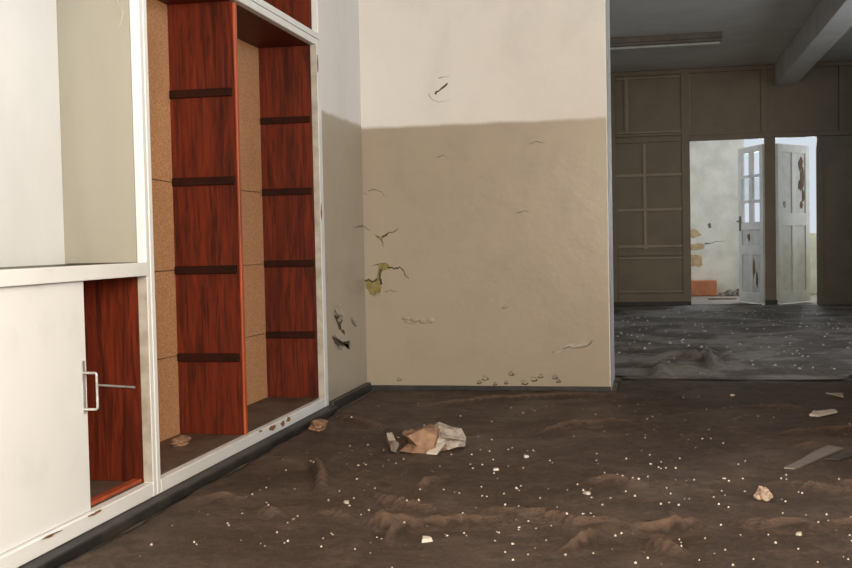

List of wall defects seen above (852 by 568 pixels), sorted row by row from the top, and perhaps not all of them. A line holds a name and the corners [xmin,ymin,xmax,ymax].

peeling [365,260,409,298]
peeling [332,304,357,350]